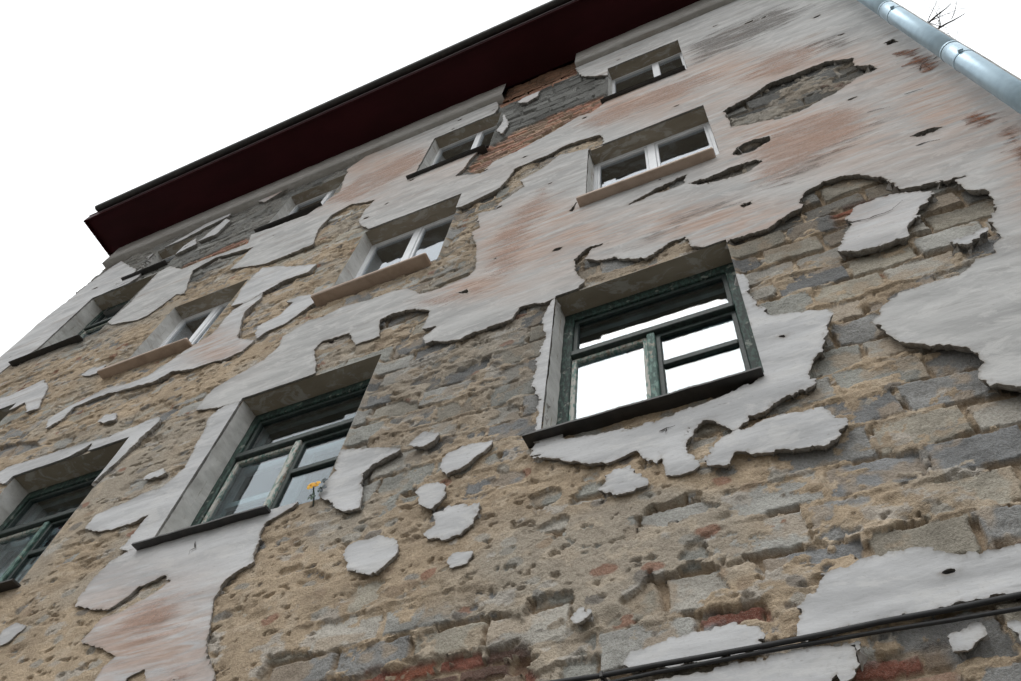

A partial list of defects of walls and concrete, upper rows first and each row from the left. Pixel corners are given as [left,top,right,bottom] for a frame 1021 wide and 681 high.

spalling [460,62,608,176]
spalling [727,61,875,126]
spalling [0,137,1021,681]